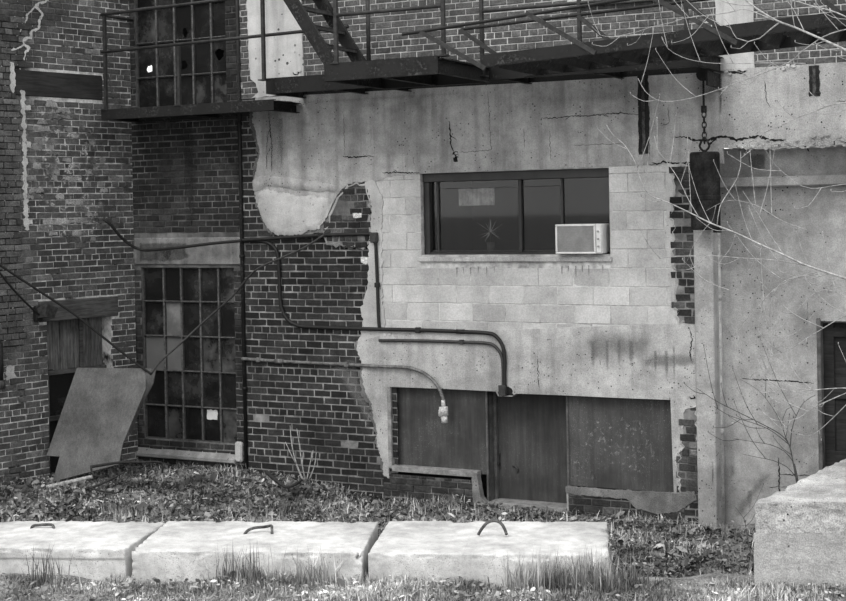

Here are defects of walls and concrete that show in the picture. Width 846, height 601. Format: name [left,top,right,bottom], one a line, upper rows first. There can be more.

crack [11,0,49,60]
crack [675,135,784,145]
spalling [723,133,846,150]
crack [649,158,690,166]
flaking render [668,163,695,324]
flaking render [673,395,698,524]
crack [770,458,810,491]